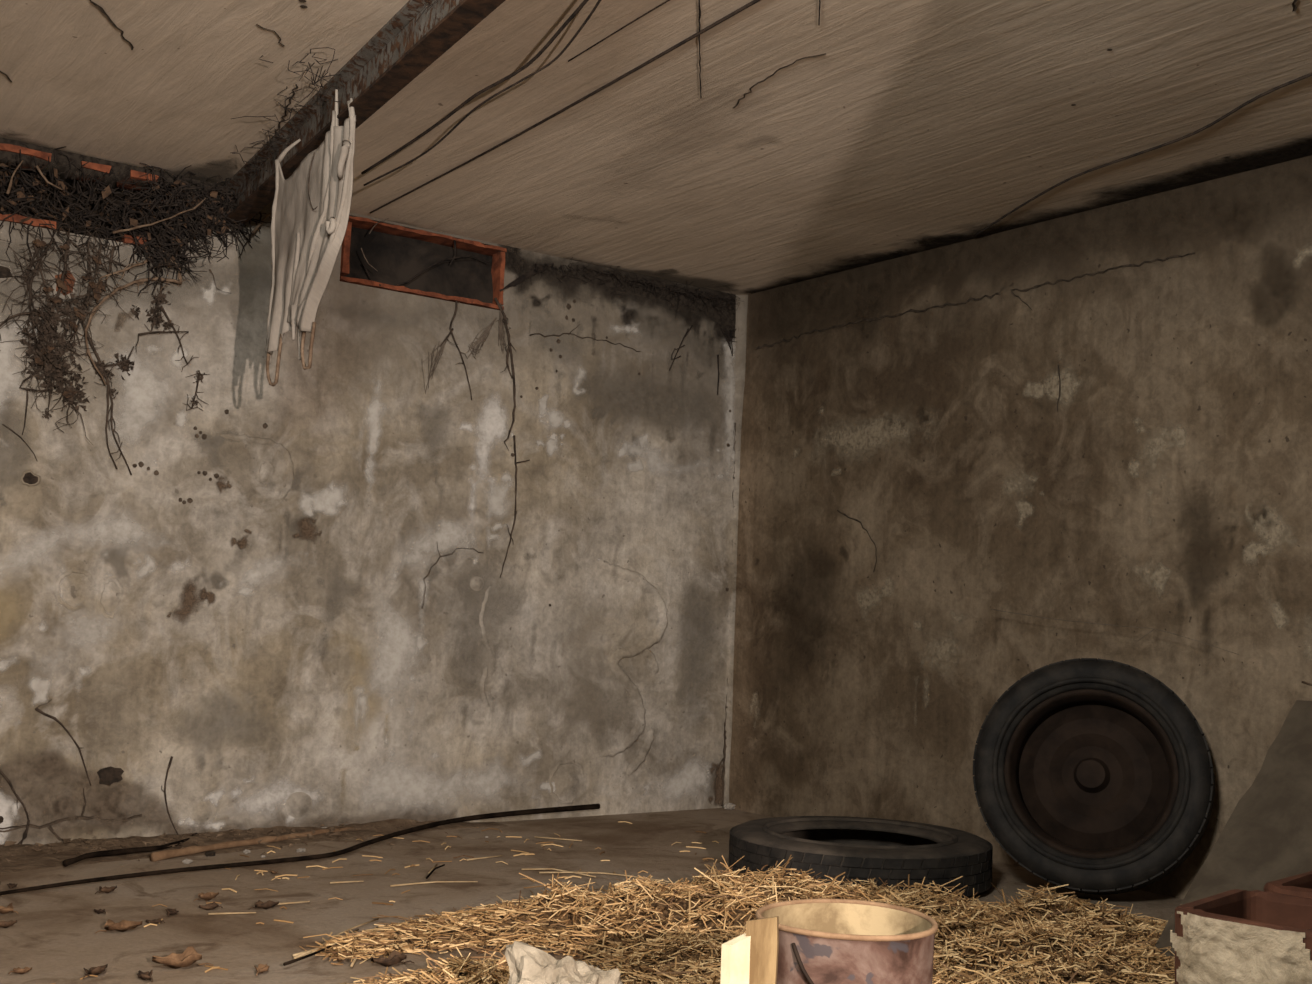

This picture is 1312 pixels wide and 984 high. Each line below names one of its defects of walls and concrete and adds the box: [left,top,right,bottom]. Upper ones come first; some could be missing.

crack [90,0,134,50]
leakage [0,327,23,403]
leakage [118,347,168,439]
leakage [365,383,383,479]
leakage [502,245,736,478]
leakage [291,472,345,530]
efflorescence [406,400,513,563]
leakage [31,679,50,703]
efflorescence [356,609,425,722]
leakage [0,753,240,845]
leakage [205,738,506,828]
leakage [645,762,714,798]